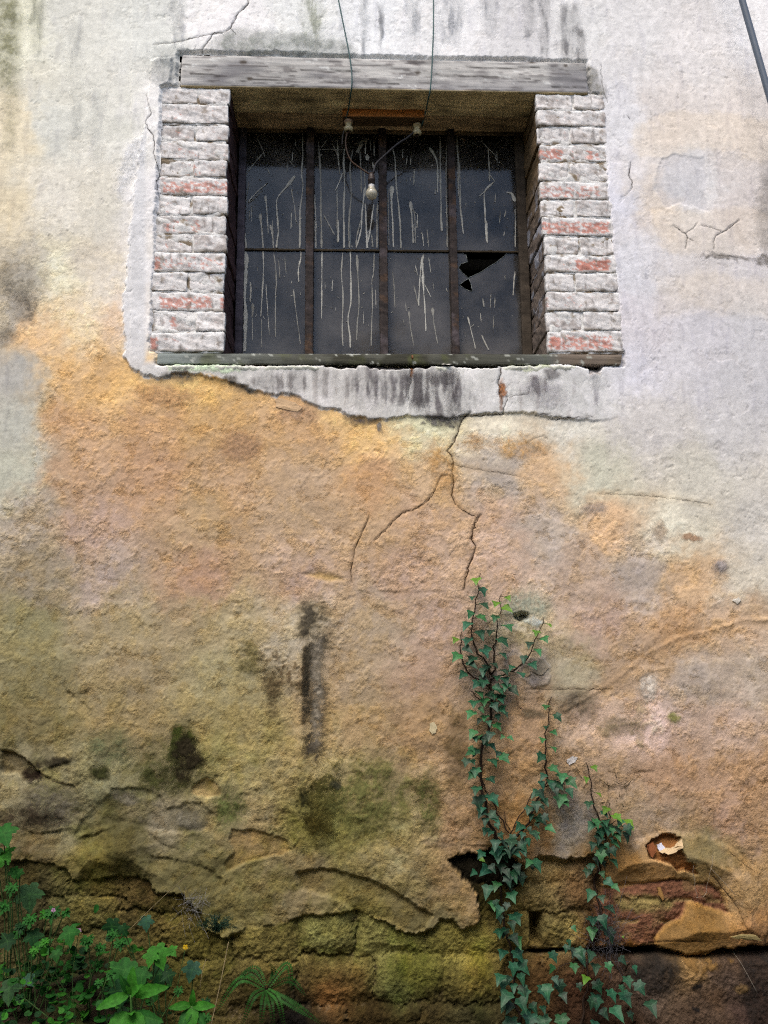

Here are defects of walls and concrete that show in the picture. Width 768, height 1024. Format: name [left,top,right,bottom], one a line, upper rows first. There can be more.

crack [153,2,249,53]
leakage [355,368,461,428]
leakage [524,364,558,393]
crack [350,368,592,587]
leakage [245,602,328,761]
flaking render [0,749,41,782]
flaking render [75,777,223,836]
flaking render [222,828,293,873]
flaking render [295,866,435,934]
flaking render [593,833,727,947]